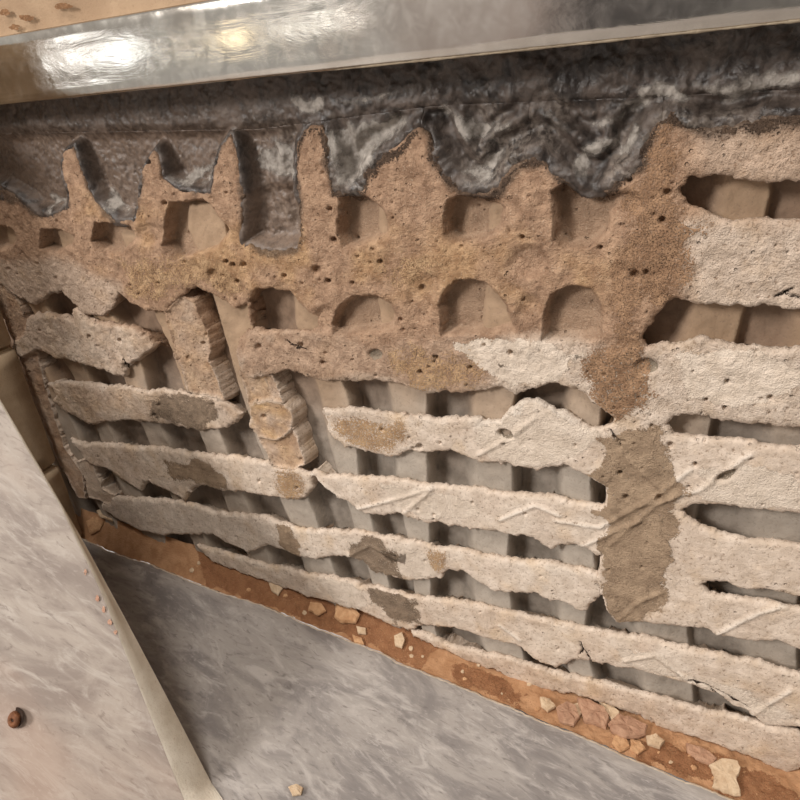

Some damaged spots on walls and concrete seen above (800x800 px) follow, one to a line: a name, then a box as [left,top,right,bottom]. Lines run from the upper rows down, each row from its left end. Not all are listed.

leakage [0,22,800,626]
spalling [453,336,583,388]
spalling [675,348,800,408]
spalling [473,402,601,467]
spalling [379,483,480,520]
spalling [698,462,800,510]
spalling [378,546,437,579]
flaking render [308,602,326,616]
flaking render [352,626,366,645]
flaking render [394,632,405,649]
spalling [618,647,795,721]
flaking render [577,697,665,755]